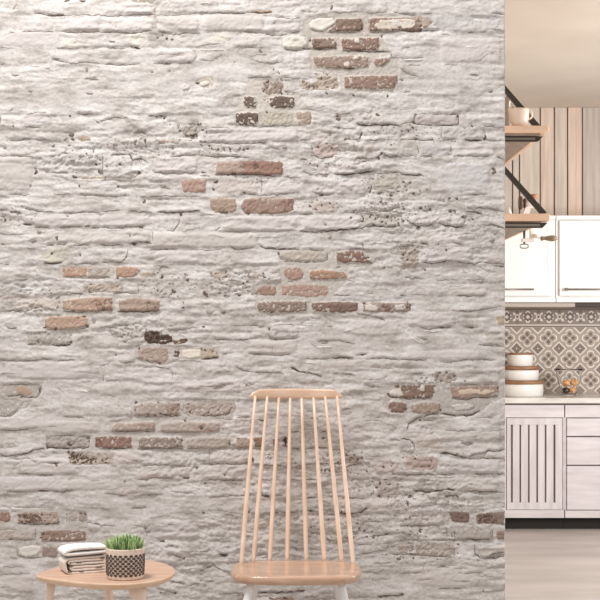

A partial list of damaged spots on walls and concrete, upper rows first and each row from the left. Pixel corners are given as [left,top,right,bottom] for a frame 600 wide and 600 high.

peeling [235,5,432,127]
spalling [153,121,283,193]
spalling [210,191,341,214]
spalling [27,262,197,346]
peeling [203,249,411,315]
spalling [109,323,219,366]
peeling [382,371,504,417]
peeling [47,399,262,465]